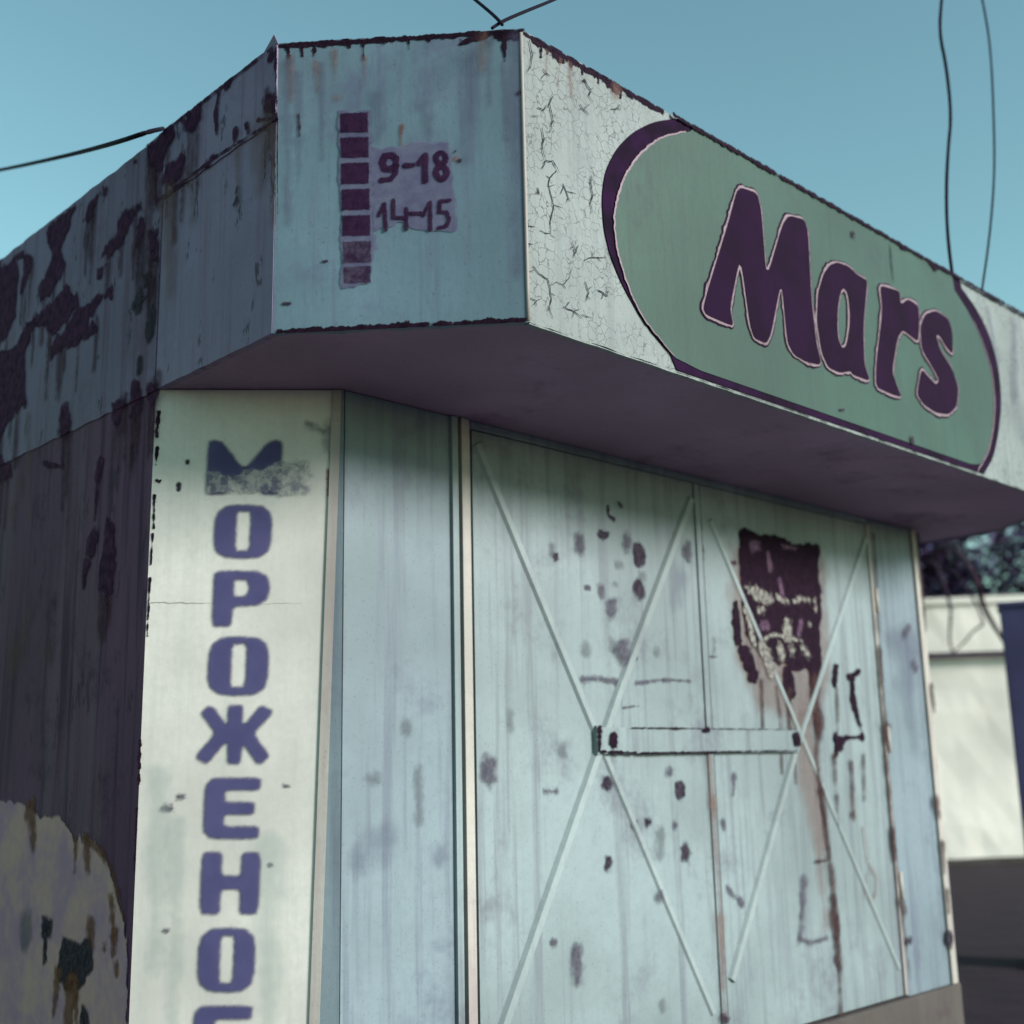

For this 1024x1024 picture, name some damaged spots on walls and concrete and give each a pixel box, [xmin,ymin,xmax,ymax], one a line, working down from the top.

crack [528,40,609,319]
rust [0,28,1024,510]
peeling [147,479,162,637]
peeling [576,534,584,553]
peeling [598,502,622,539]
peeling [623,535,646,599]
peeling [585,585,617,617]
peeling [602,776,613,791]
peeling [668,768,686,800]
rust [598,527,866,1015]
peeling [681,843,690,862]
peeling [0,800,128,1024]